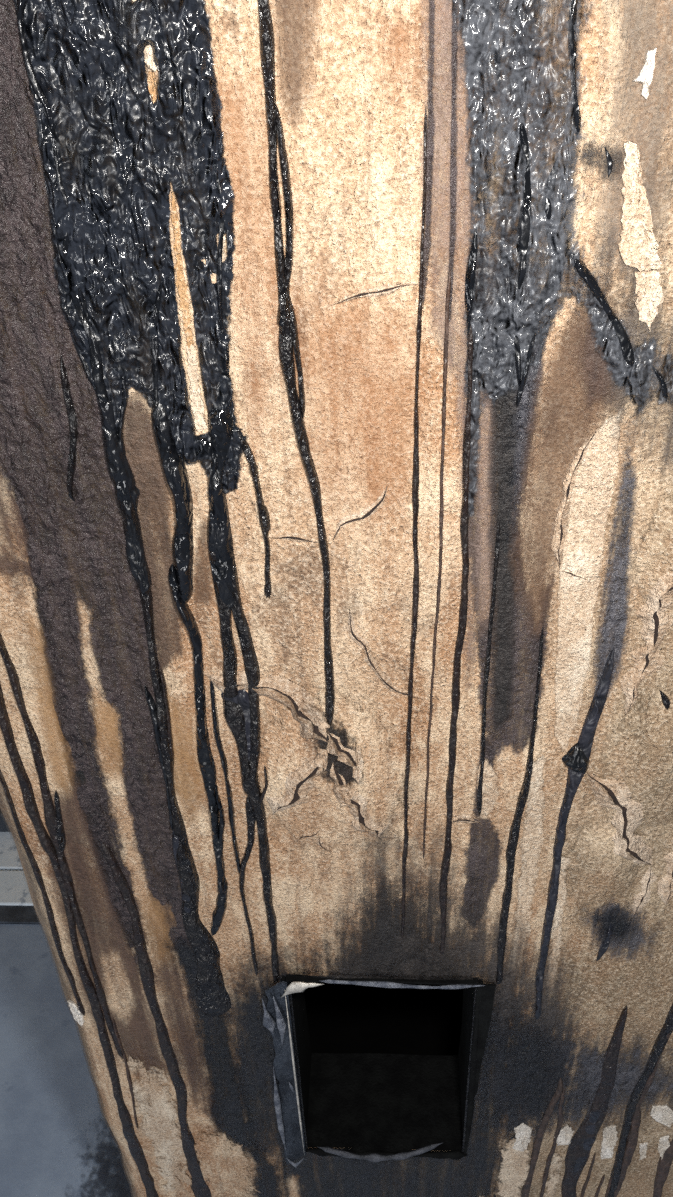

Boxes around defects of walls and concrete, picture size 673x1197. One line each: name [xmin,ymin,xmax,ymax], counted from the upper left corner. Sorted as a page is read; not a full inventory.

spalling [618,141,664,332]
damp [61,354,78,499]
damp [360,0,673,1197]
damp [0,393,279,1197]
crack [204,671,389,851]
peeling [601,1124,618,1159]
peeling [639,1104,673,1160]